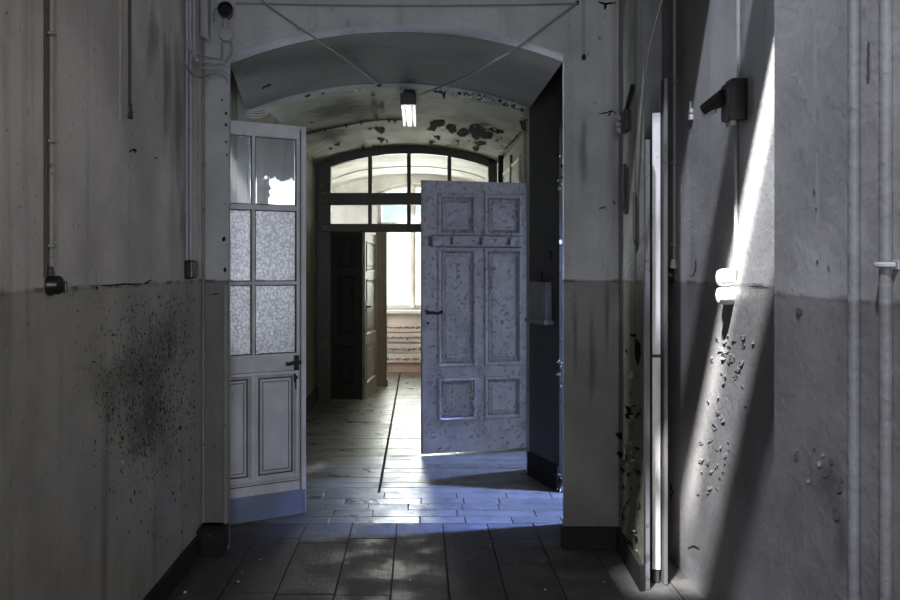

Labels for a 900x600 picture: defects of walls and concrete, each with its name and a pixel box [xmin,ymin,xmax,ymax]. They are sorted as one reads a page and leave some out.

spalling [434,87,528,131]
spalling [427,119,505,152]
spalling [625,334,641,379]
water stain [70,294,196,536]
flaking render [616,405,641,555]